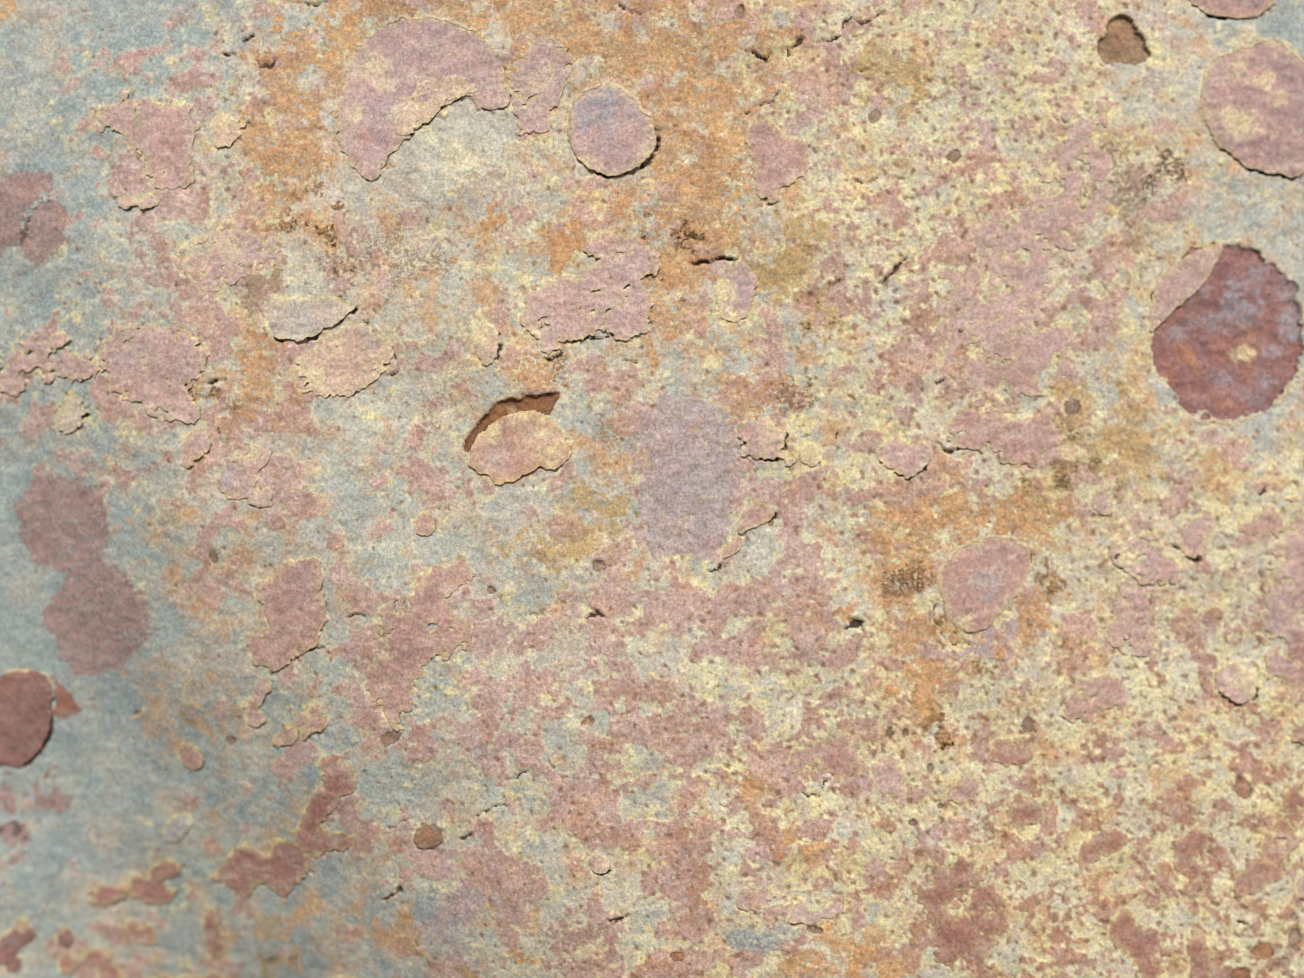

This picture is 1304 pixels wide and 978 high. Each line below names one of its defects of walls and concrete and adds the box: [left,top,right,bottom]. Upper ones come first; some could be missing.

spalling [1097,15,1151,65]
peeling [1190,0,1275,20]
peeling [334,14,661,207]
peeling [1197,37,1304,188]
rust [185,0,857,446]
spalling [1148,242,1304,426]
rust [494,338,639,454]
peeling [936,534,1035,634]
peeling [0,671,54,767]